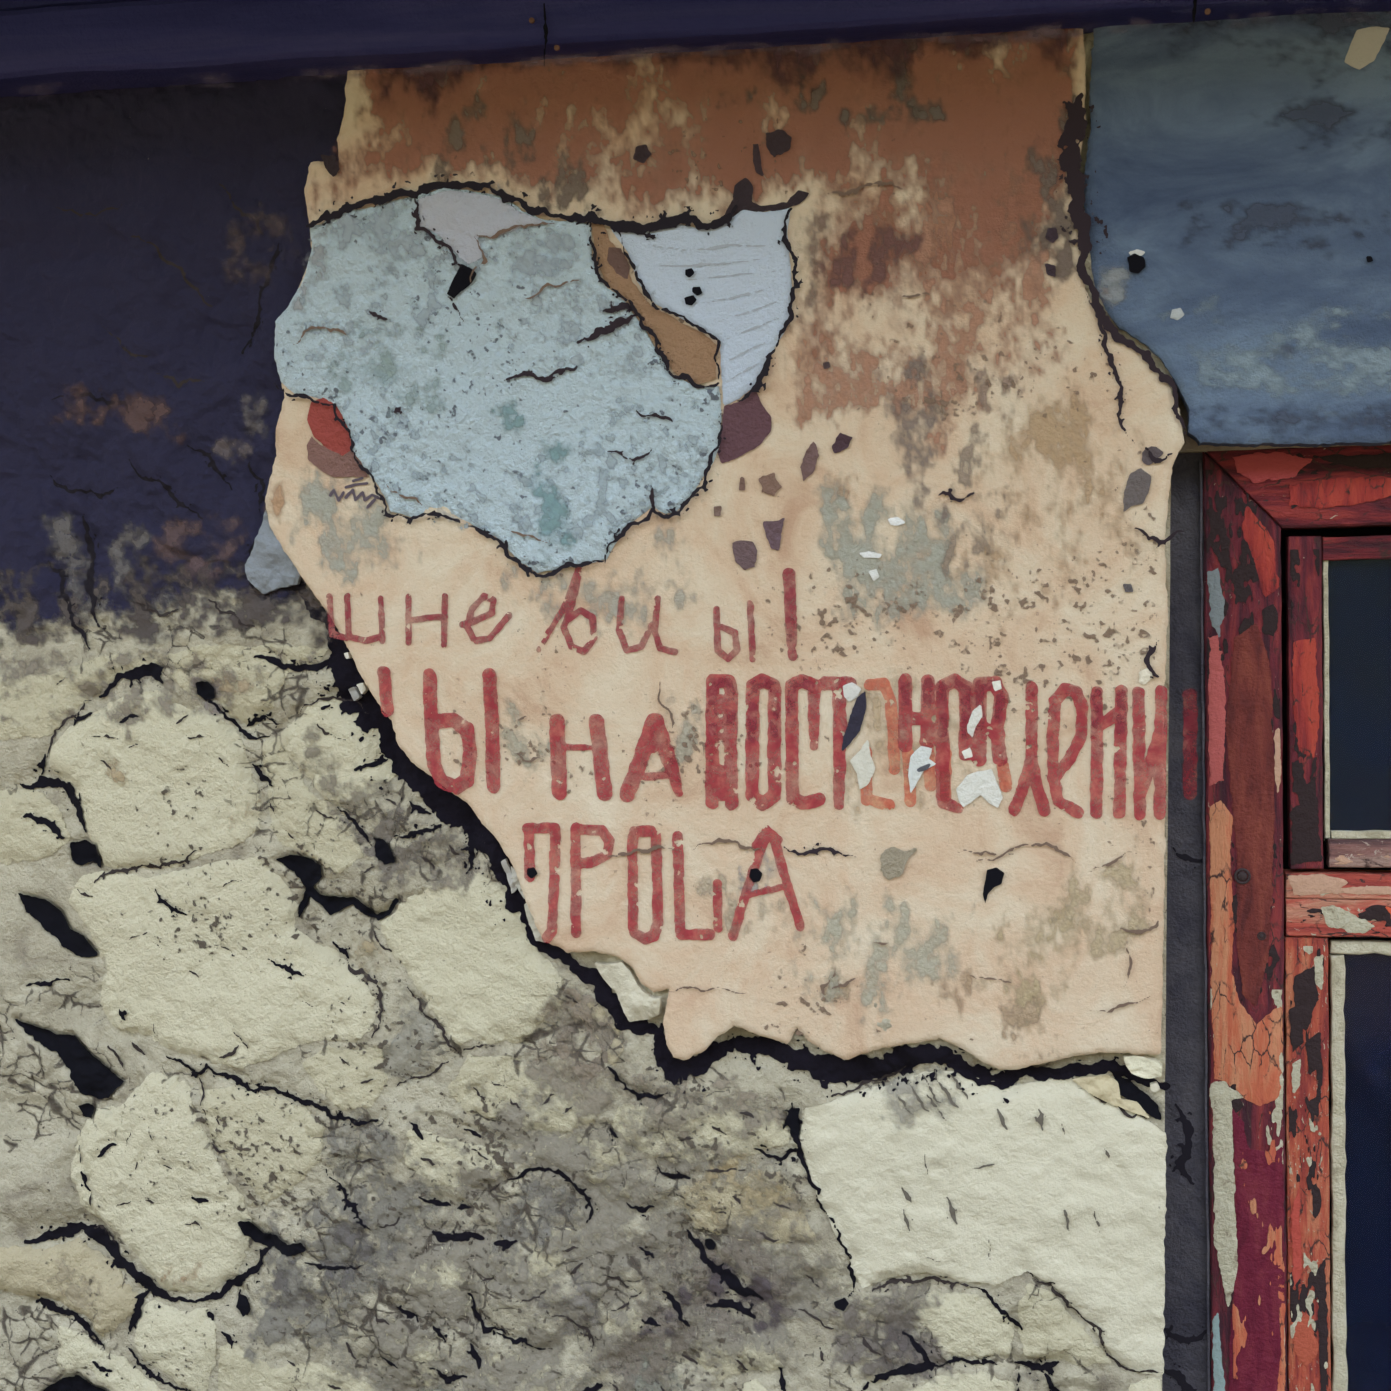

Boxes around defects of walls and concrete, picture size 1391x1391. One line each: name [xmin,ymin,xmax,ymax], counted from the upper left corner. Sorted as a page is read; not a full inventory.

water stain [382,64,486,103]
water stain [661,28,1070,127]
water stain [808,214,922,307]
water stain [1023,148,1075,280]
crack [1055,93,1186,464]
flaking render [274,129,809,573]
flaking render [245,510,302,594]
flaking render [842,682,875,789]
crack [0,445,1207,1391]
peeling [1206,452,1391,1391]
flaking render [595,960,662,1022]
flaking render [1073,1054,1162,1118]